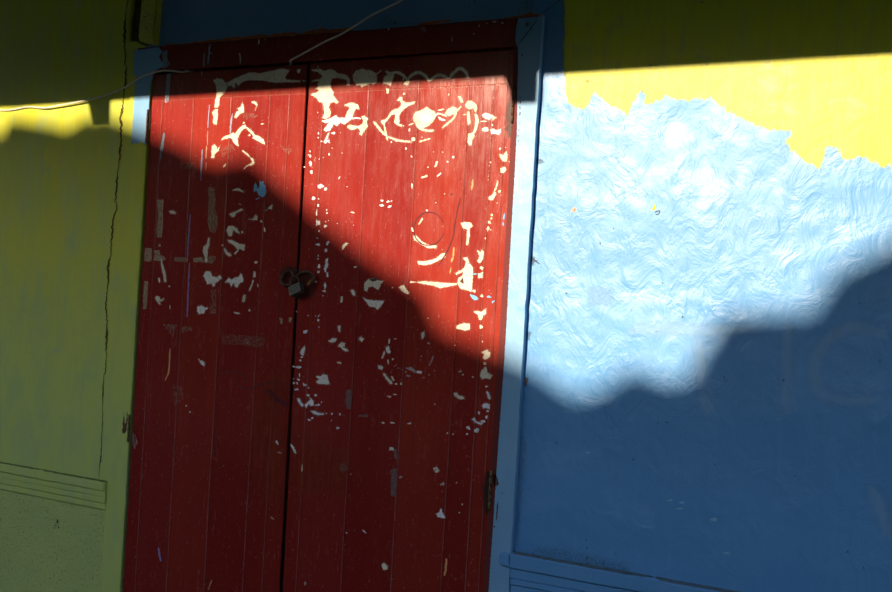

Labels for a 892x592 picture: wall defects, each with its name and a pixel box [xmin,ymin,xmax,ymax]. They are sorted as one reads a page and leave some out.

peeling [210,66,501,174]
peeling [488,147,508,203]
crack [98,0,149,479]
peeling [143,187,273,315]
peeling [312,184,338,296]
peeling [340,222,485,310]
peeling [411,202,446,266]
peeling [455,308,487,333]
peeling [293,346,341,429]
peeling [378,338,435,398]
peeling [458,341,492,435]